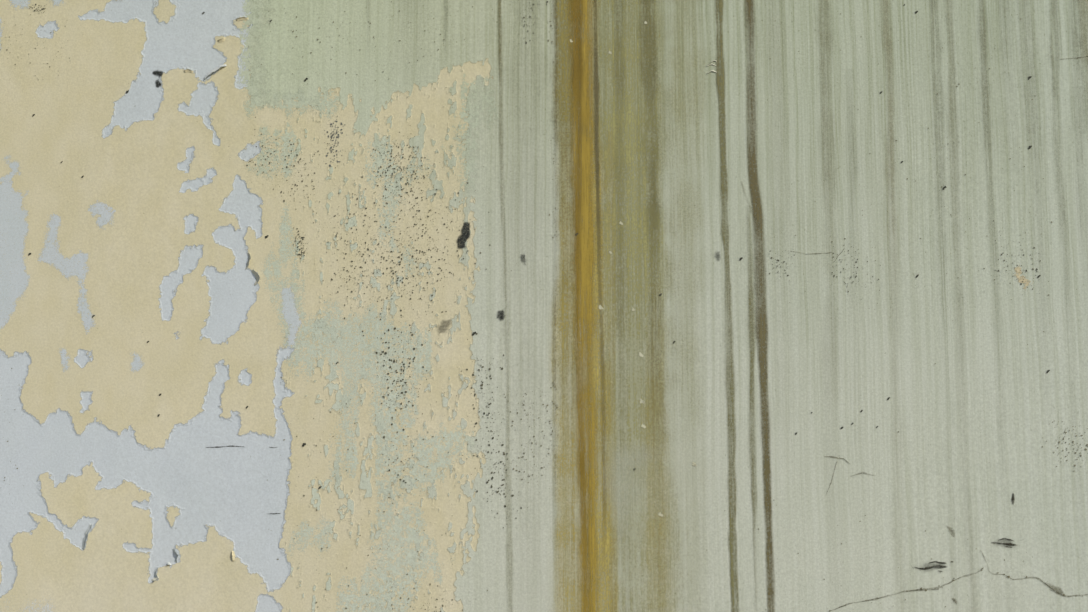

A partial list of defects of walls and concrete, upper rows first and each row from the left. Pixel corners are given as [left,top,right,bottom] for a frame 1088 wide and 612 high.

peeling [0,0,493,612]
corrosion [555,0,612,612]
leakage [597,0,675,496]
leakage [716,0,795,612]